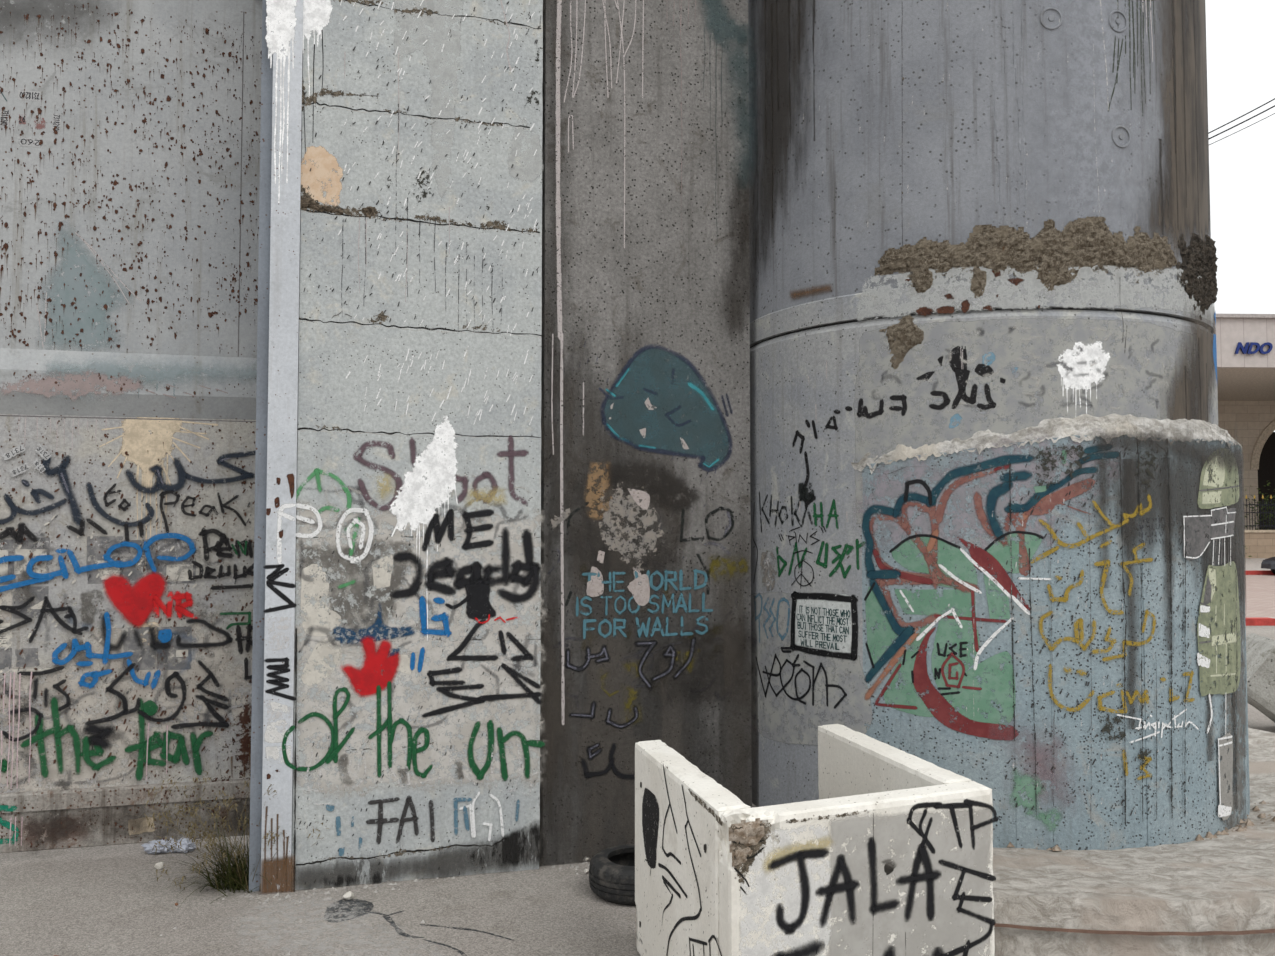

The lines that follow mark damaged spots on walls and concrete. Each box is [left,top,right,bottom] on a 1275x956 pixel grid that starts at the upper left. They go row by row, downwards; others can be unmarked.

rust [0,4,262,354]
damp [728,0,815,329]
spalling [874,216,1218,320]
spalling [879,315,924,369]
spalling [1033,444,1090,489]
spalling [1098,715,1126,741]
spalling [688,789,867,895]